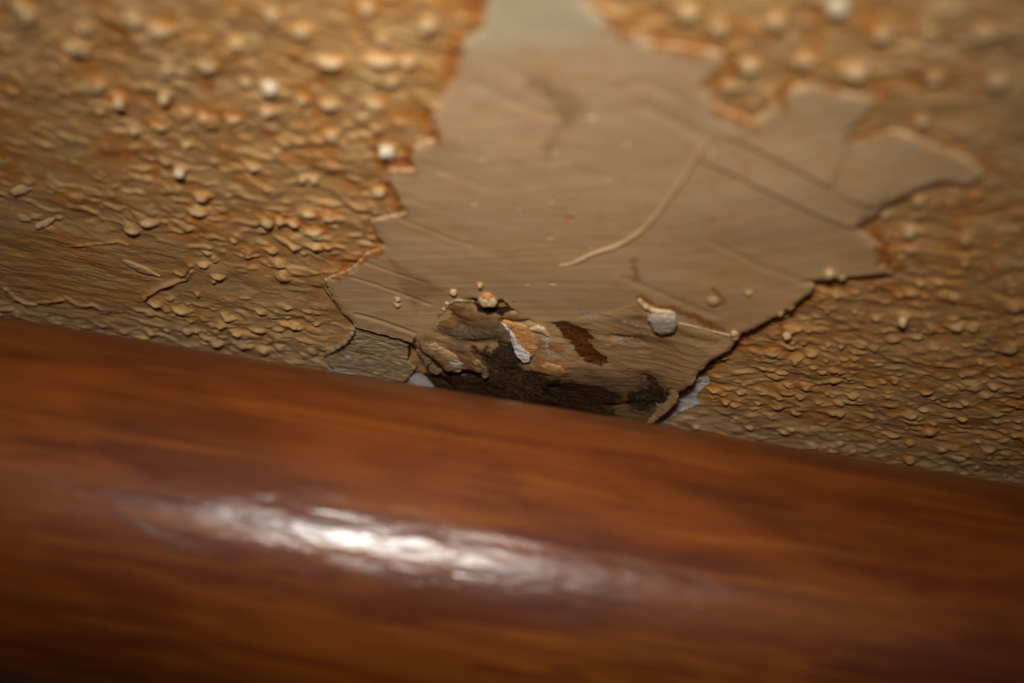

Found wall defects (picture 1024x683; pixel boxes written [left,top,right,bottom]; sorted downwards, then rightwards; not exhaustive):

water stain [419,305,678,421]
peeling [324,0,985,425]